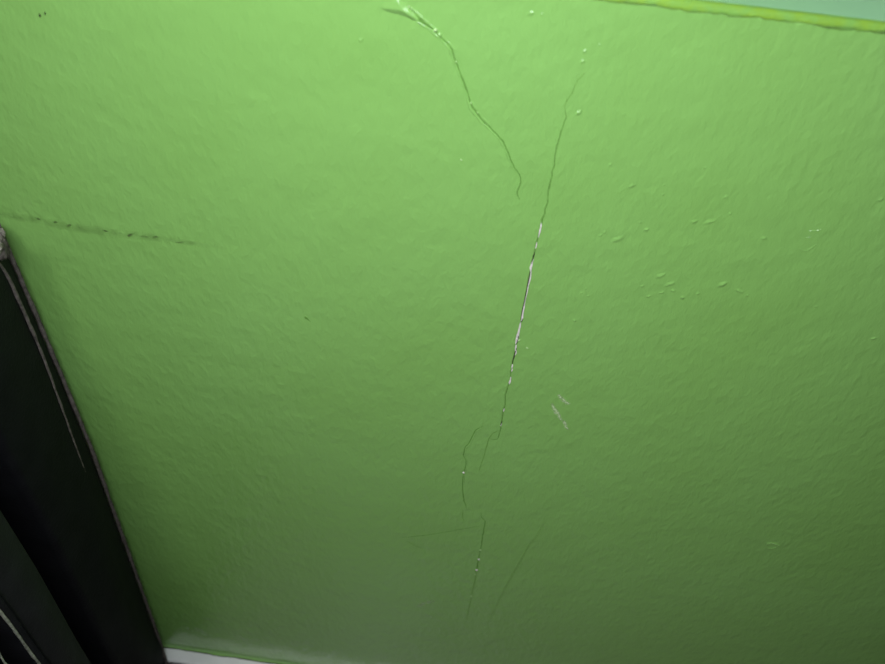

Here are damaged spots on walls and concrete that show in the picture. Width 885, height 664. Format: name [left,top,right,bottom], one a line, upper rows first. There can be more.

crack [408,5,521,200]
crack [462,74,584,618]